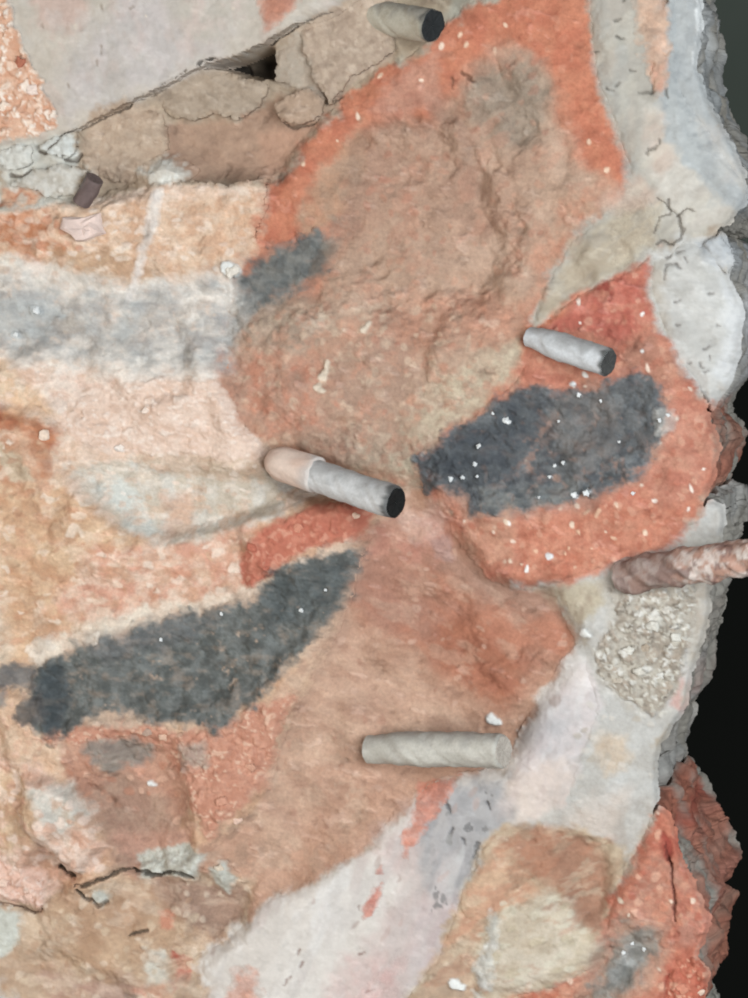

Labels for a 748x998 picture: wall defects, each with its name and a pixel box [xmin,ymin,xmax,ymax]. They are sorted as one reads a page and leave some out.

crack [8,12,343,178]
crack [58,863,195,909]
crack [128,928,149,937]